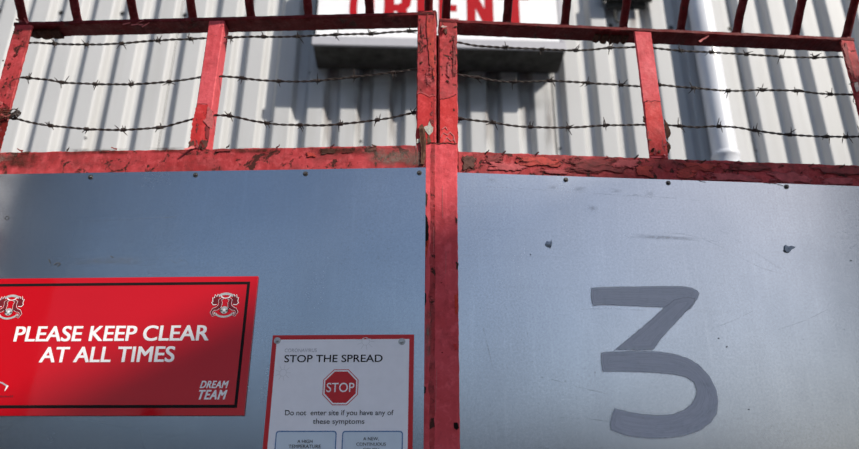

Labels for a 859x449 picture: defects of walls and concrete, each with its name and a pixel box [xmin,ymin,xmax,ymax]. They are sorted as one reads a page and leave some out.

peeling [0,76,13,148]
peeling [306,144,378,157]
peeling [417,13,458,144]
peeling [462,100,859,186]
peeling [841,42,859,110]